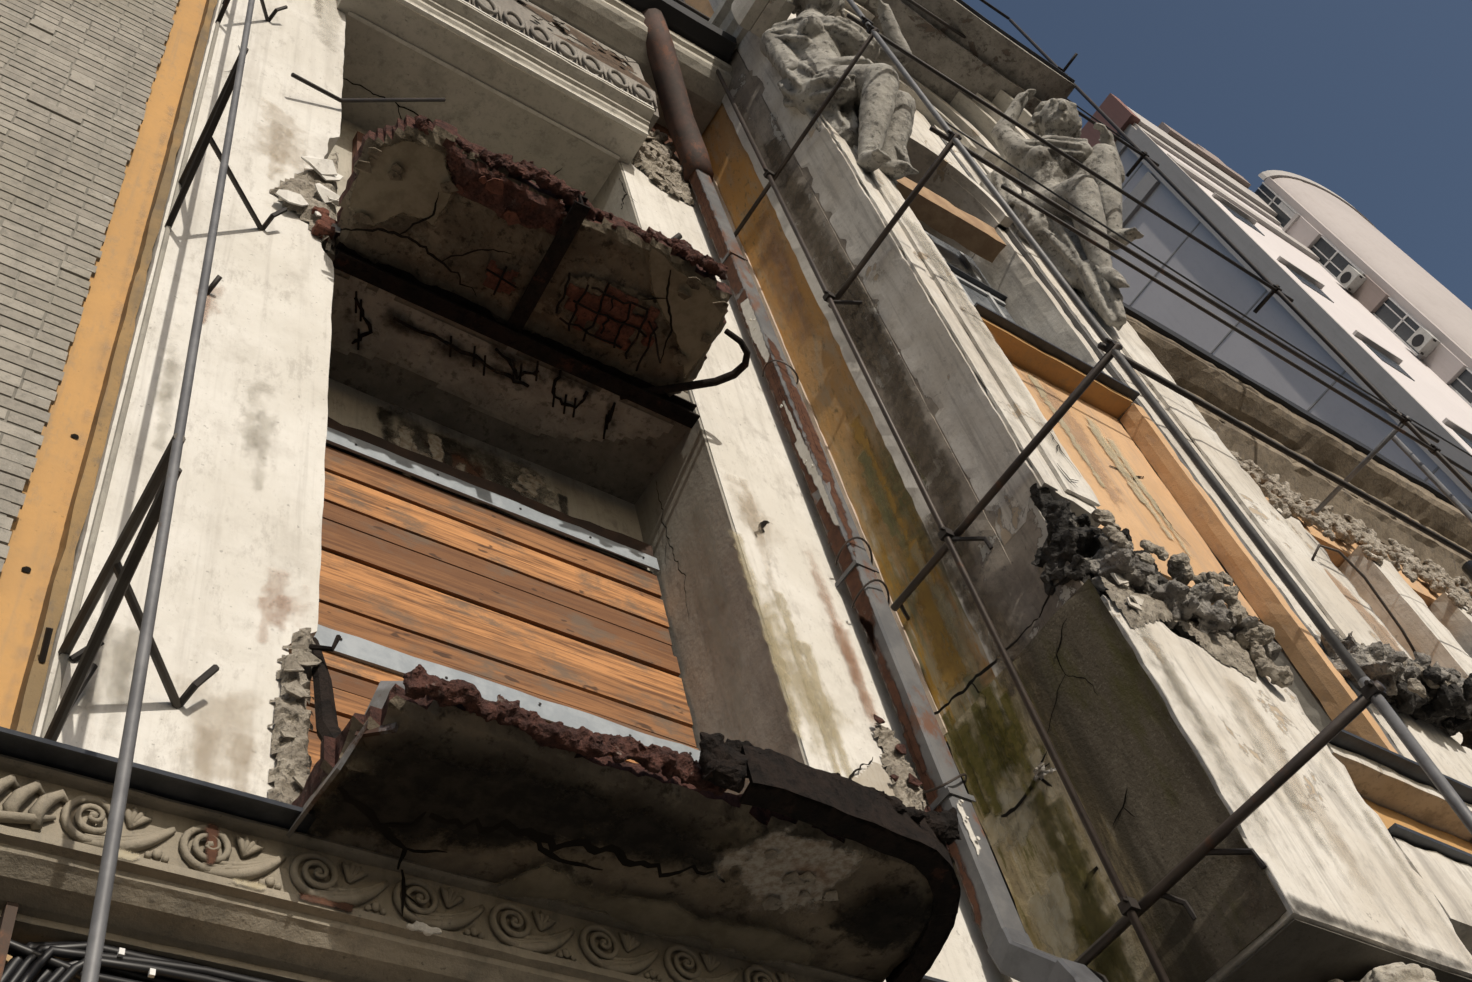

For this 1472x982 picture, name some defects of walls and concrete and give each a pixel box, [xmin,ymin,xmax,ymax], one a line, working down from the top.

flaking render [269,140,459,254]
crack [341,192,514,297]
spalling [331,274,674,442]
crack [642,270,673,360]
flaking render [649,248,769,376]
flaking render [267,627,322,805]
flaking render [849,714,931,812]
leakage [764,138,1135,982]
crack [934,570,1097,818]
spalling [1030,483,1294,688]
spalling [1320,570,1472,750]
crack [338,786,725,916]